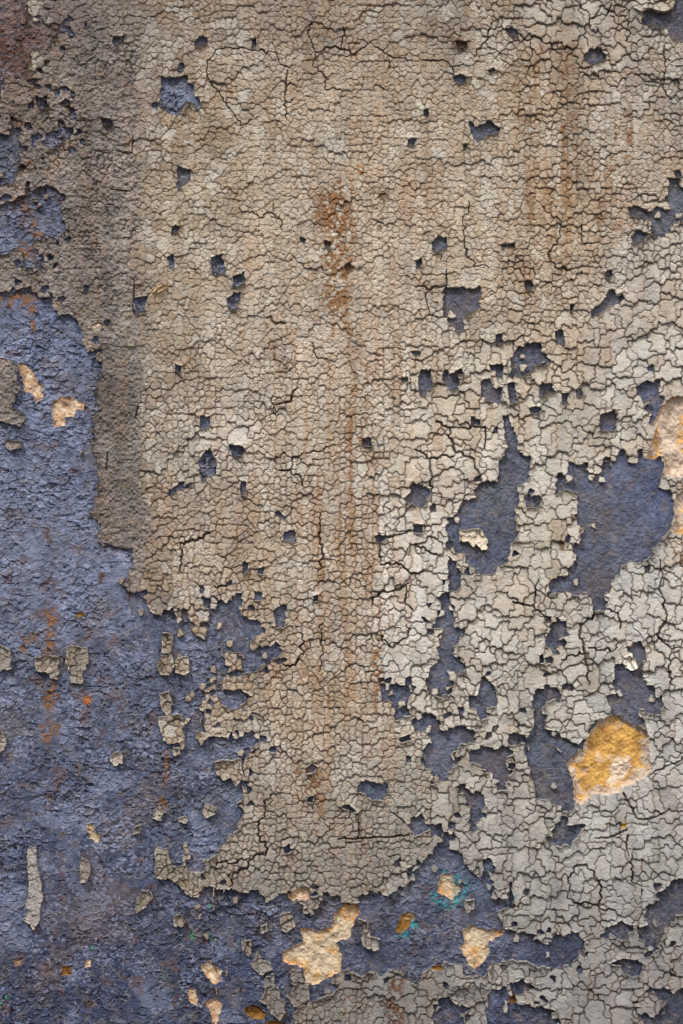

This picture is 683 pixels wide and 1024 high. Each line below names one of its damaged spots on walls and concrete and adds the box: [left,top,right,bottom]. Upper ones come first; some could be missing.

peeling [152,63,208,118]
crack [206,22,455,126]
crack [476,0,631,57]
corrosion [316,180,355,335]
crack [415,420,487,493]
peeling [0,182,664,1024]
crack [370,530,439,649]
crack [561,608,622,685]
crack [656,559,683,685]
crack [567,863,619,916]
peeling [599,878,683,977]
peeling [632,972,683,1024]